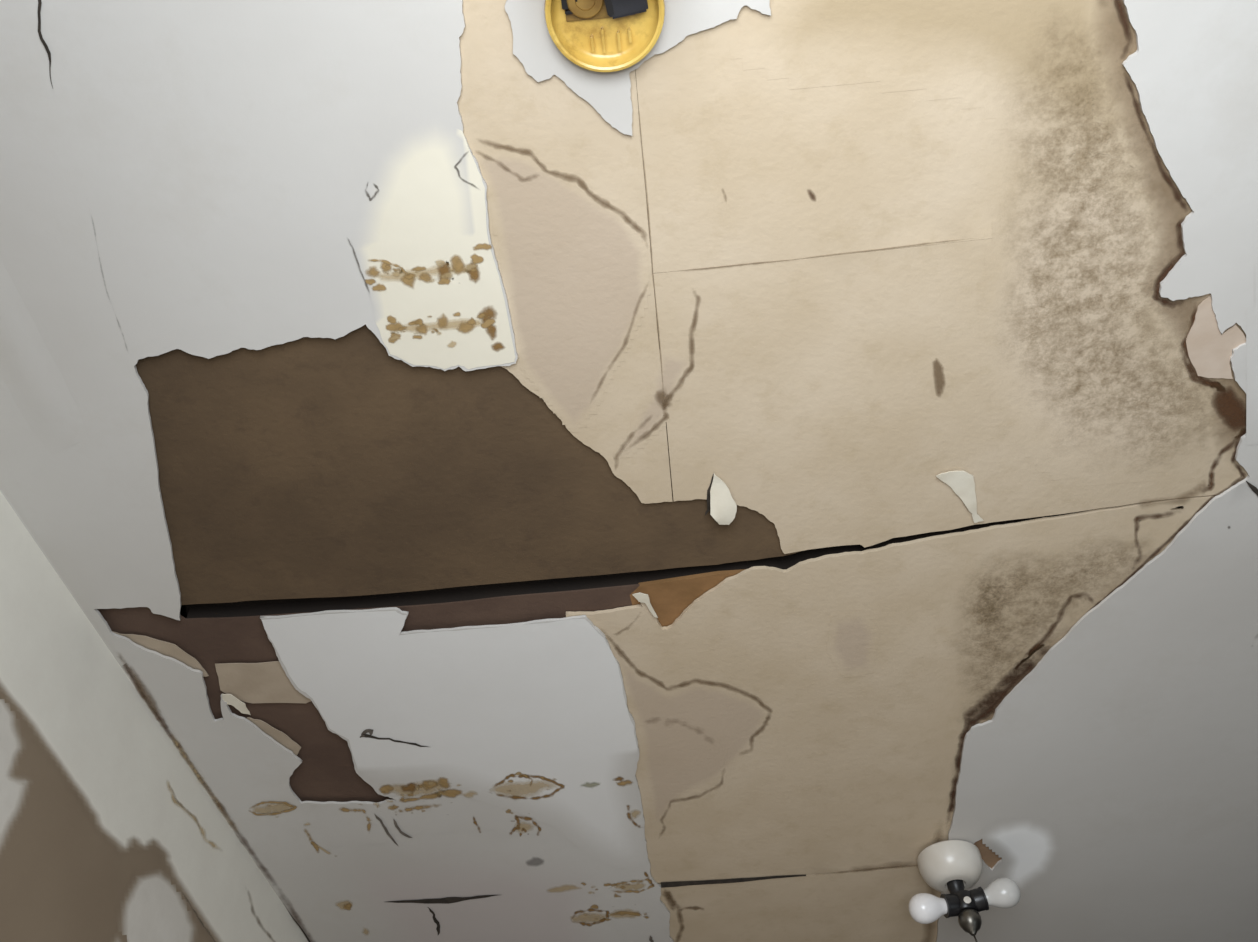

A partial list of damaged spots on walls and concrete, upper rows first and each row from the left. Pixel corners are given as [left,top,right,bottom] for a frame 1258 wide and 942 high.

crack [38,0,53,88]
leakage [729,0,1246,611]
flaking render [349,0,1248,942]
crack [1246,481,1258,496]
crack [185,508,1099,618]
flaking render [222,694,251,715]
leakage [949,571,1086,812]